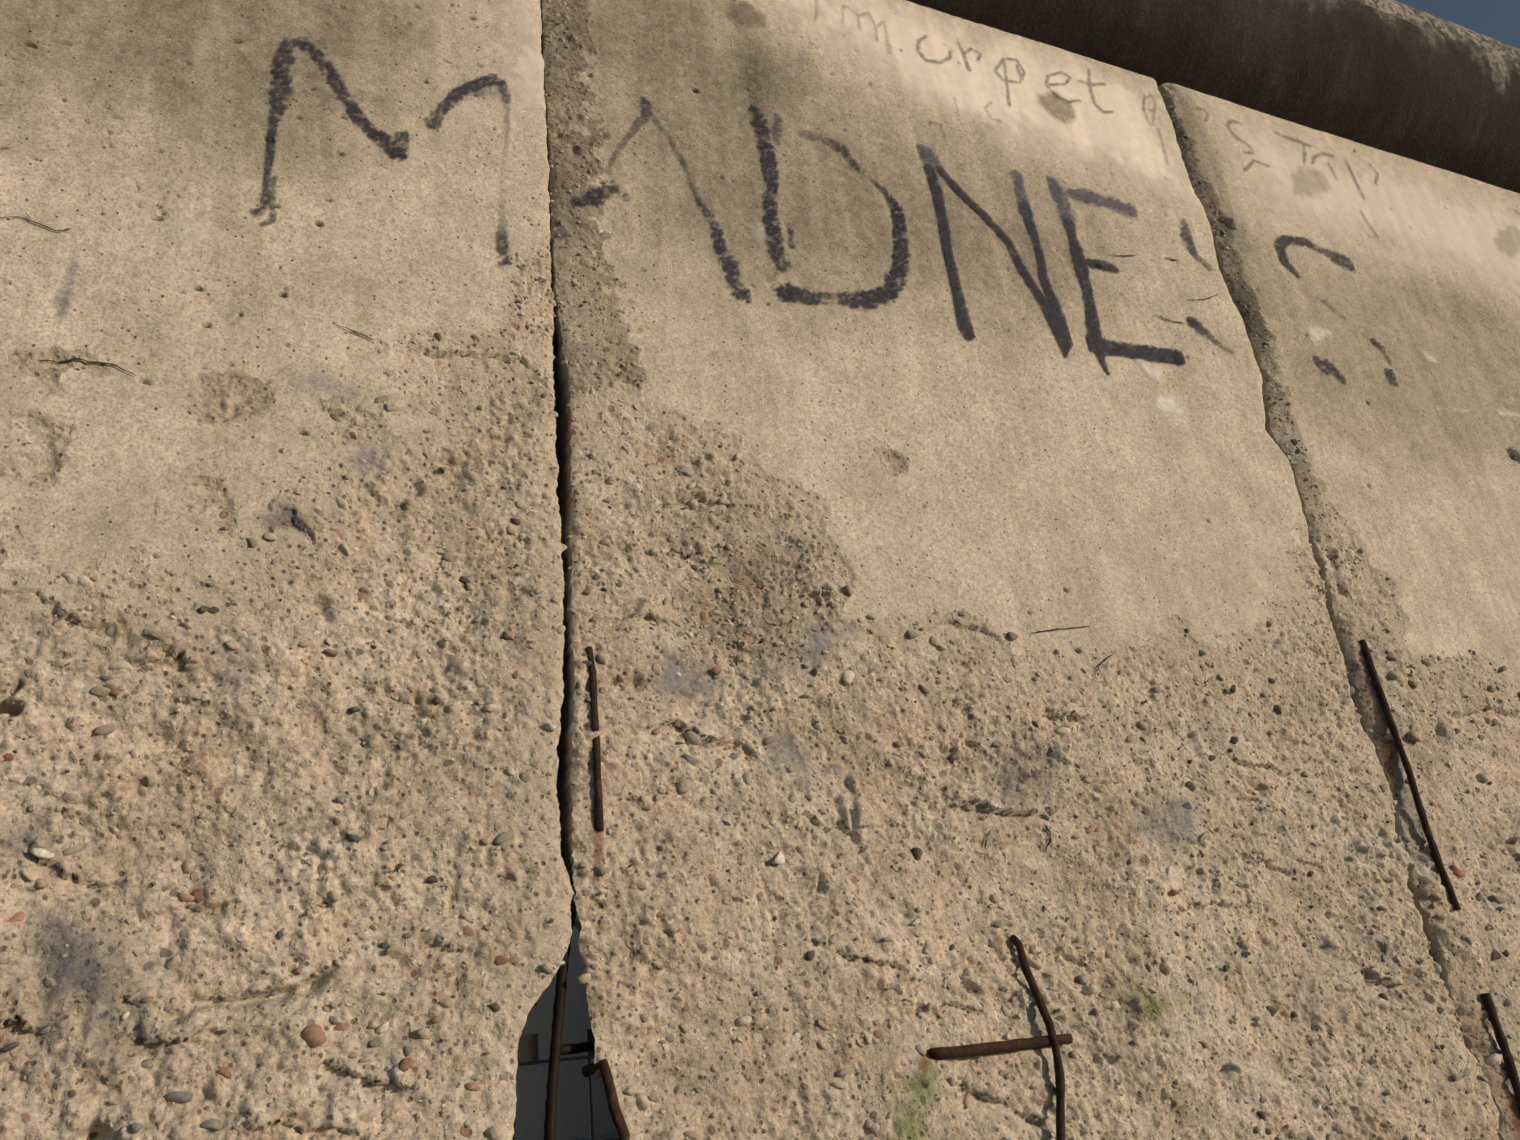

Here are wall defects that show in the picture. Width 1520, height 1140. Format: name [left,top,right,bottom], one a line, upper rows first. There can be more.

spalling [0,0,648,1140]
spalling [560,83,1520,1140]